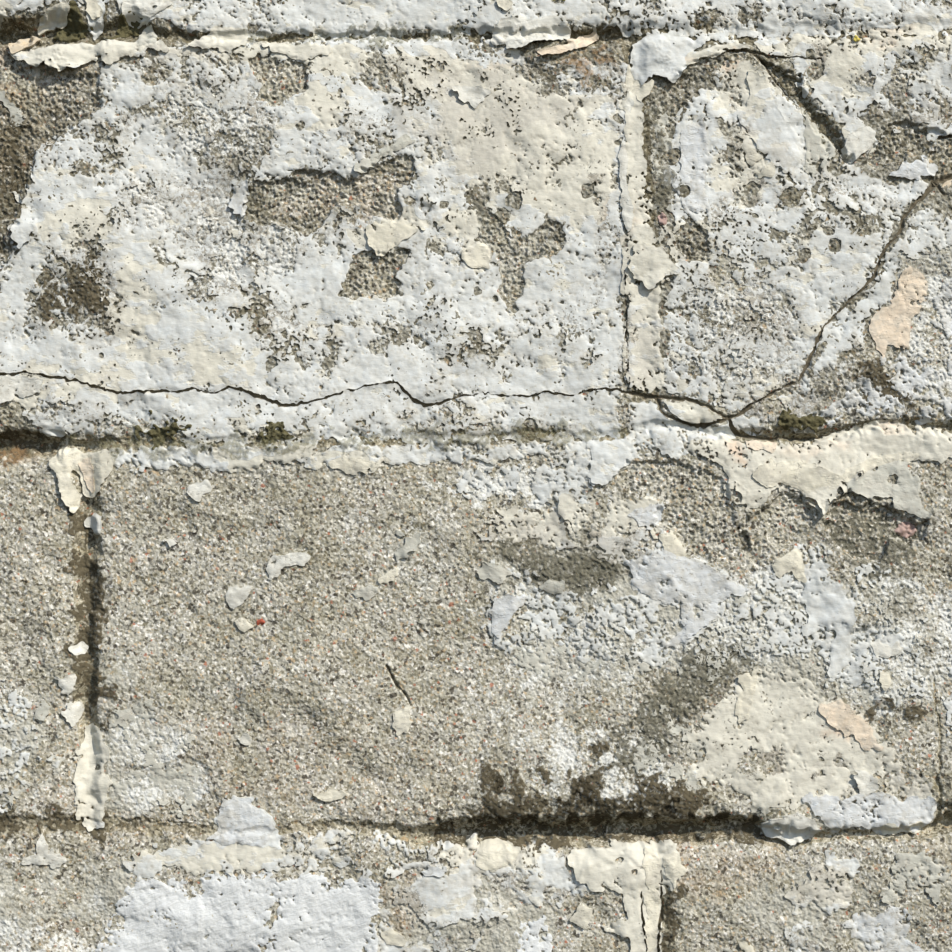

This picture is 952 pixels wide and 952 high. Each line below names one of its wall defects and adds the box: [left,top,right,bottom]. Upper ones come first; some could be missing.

crack [723,49,821,103]
crack [0,174,952,442]
peeling [187,479,212,502]
peeling [84,513,102,535]
peeling [266,552,311,580]
leakage [57,509,118,731]
peeling [226,585,253,632]
leakage [465,640,760,835]
peeling [628,722,674,783]
peeling [21,834,67,869]
peeling [95,795,687,952]
peeling [784,850,951,952]